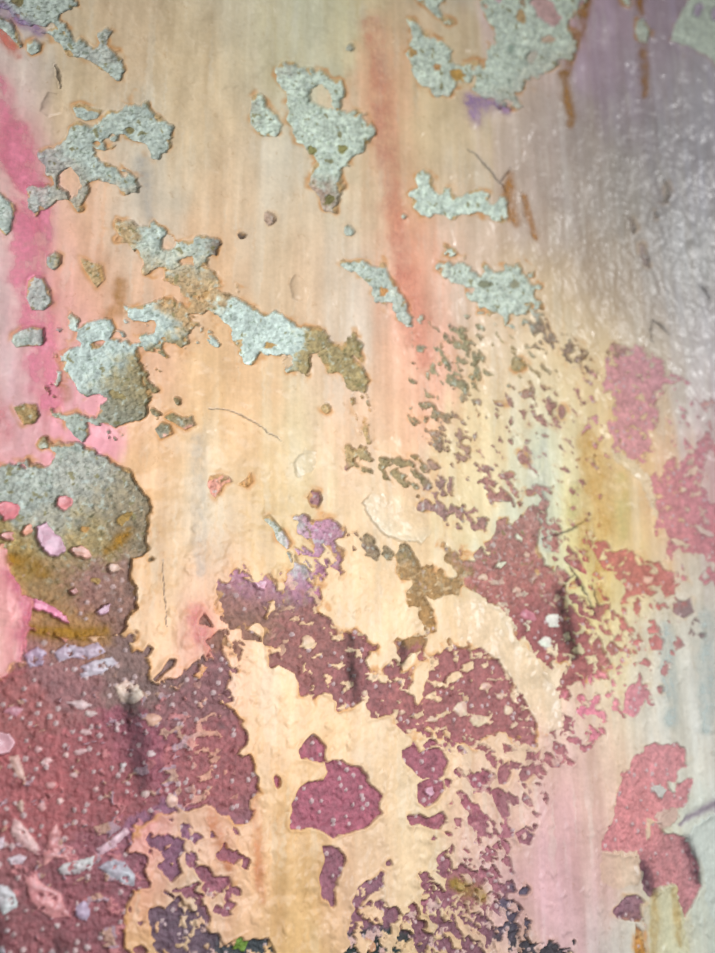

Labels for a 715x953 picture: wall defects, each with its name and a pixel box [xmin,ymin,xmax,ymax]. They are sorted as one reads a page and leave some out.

peeling [404,0,590,112]
peeling [669,0,715,64]
peeling [0,89,176,237]
spalling [264,211,277,226]
peeling [249,58,379,215]
peeling [0,215,715,953]